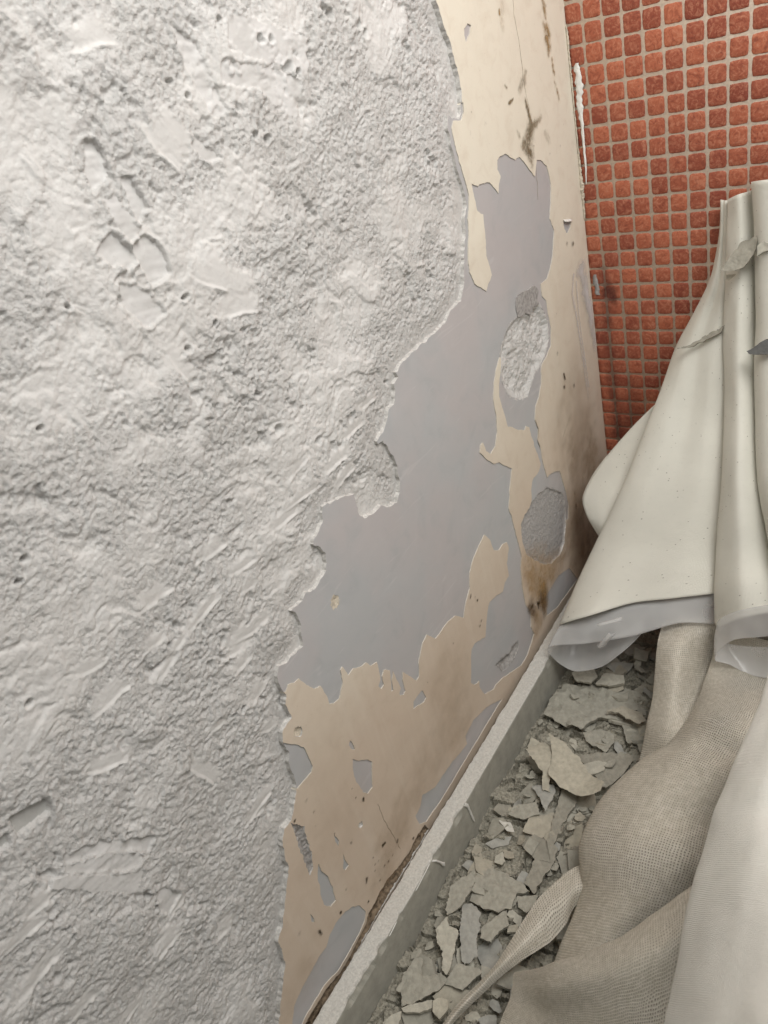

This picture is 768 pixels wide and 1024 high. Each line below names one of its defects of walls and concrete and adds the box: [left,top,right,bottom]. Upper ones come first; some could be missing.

damp [506,87,538,156]
spalling [0,0,577,1024]
peeling [383,719,657,1024]